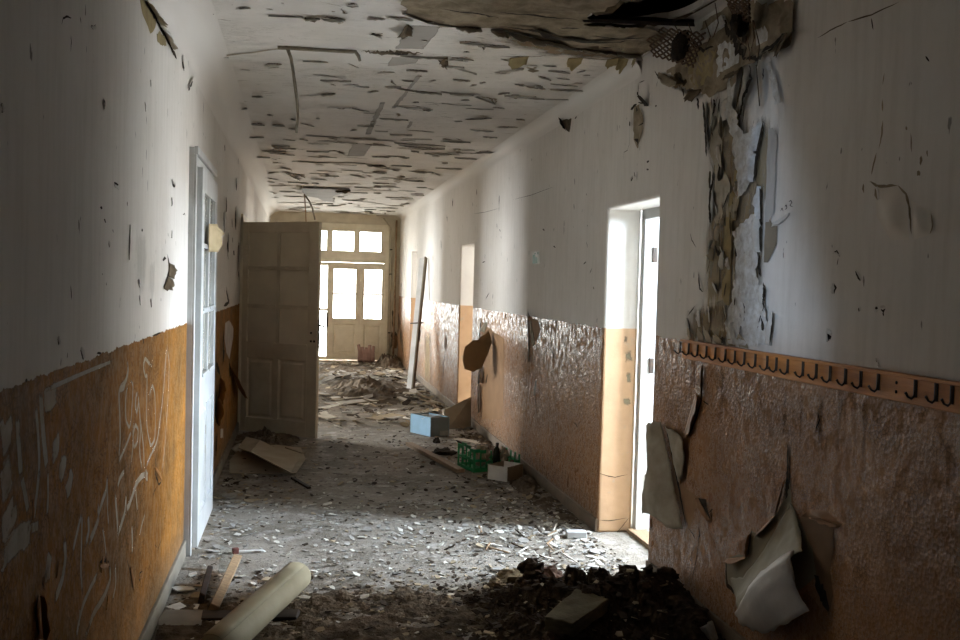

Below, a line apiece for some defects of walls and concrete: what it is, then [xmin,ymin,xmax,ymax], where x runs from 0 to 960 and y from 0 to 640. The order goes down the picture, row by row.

peeling [140,0,186,69]
crack [818,2,898,38]
flaking render [250,0,672,226]
peeling [655,0,794,349]
peeling [163,254,178,291]
peeling [462,321,504,420]
peeling [641,421,713,529]
peeling [724,445,839,633]